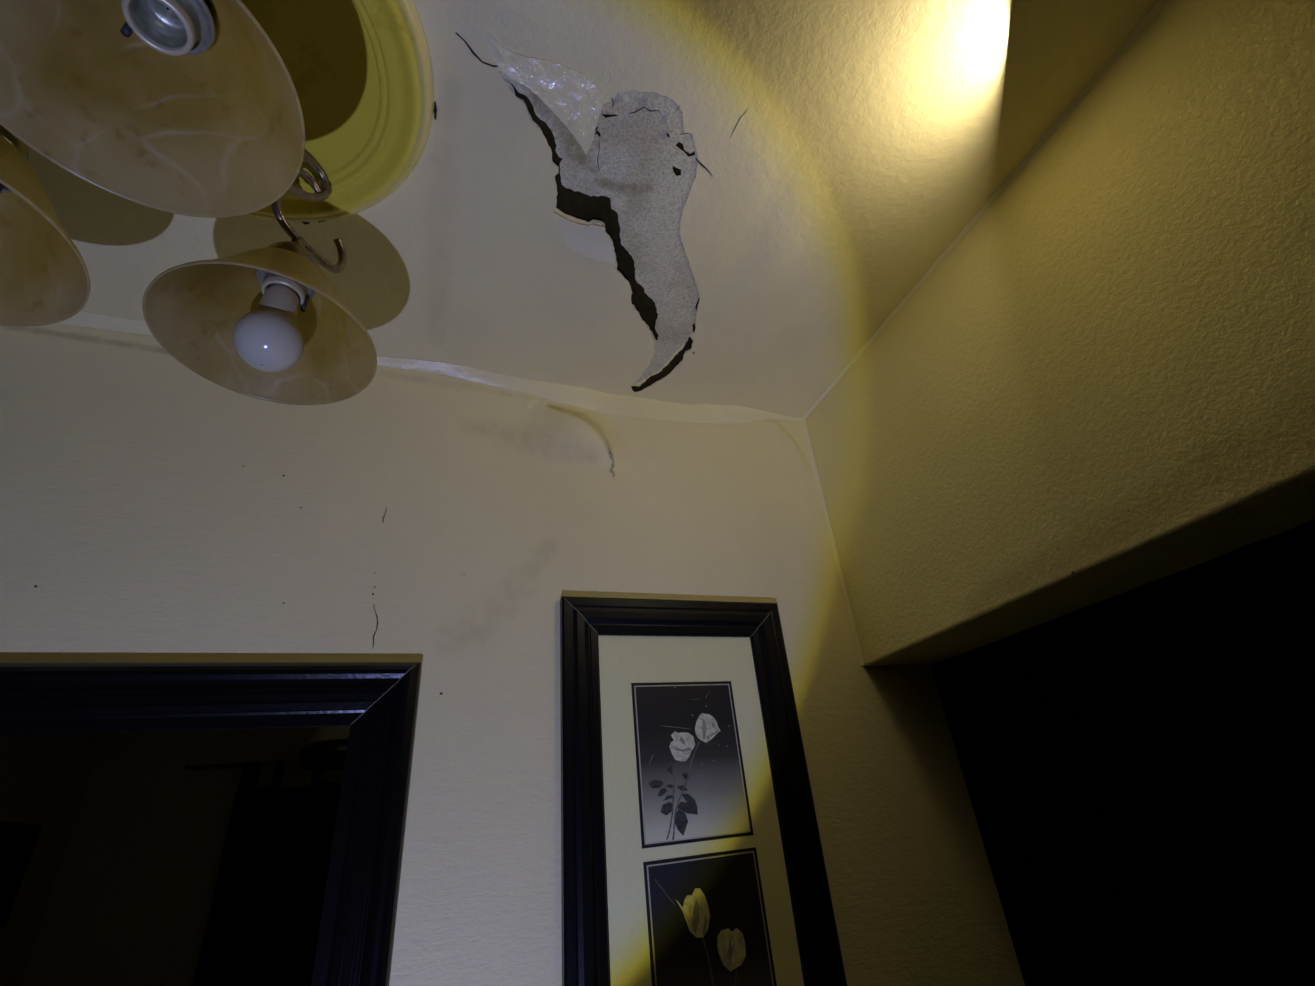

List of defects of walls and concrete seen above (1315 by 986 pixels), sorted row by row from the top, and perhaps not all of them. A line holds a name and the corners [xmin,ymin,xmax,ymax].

flaking render [462,0,699,385]